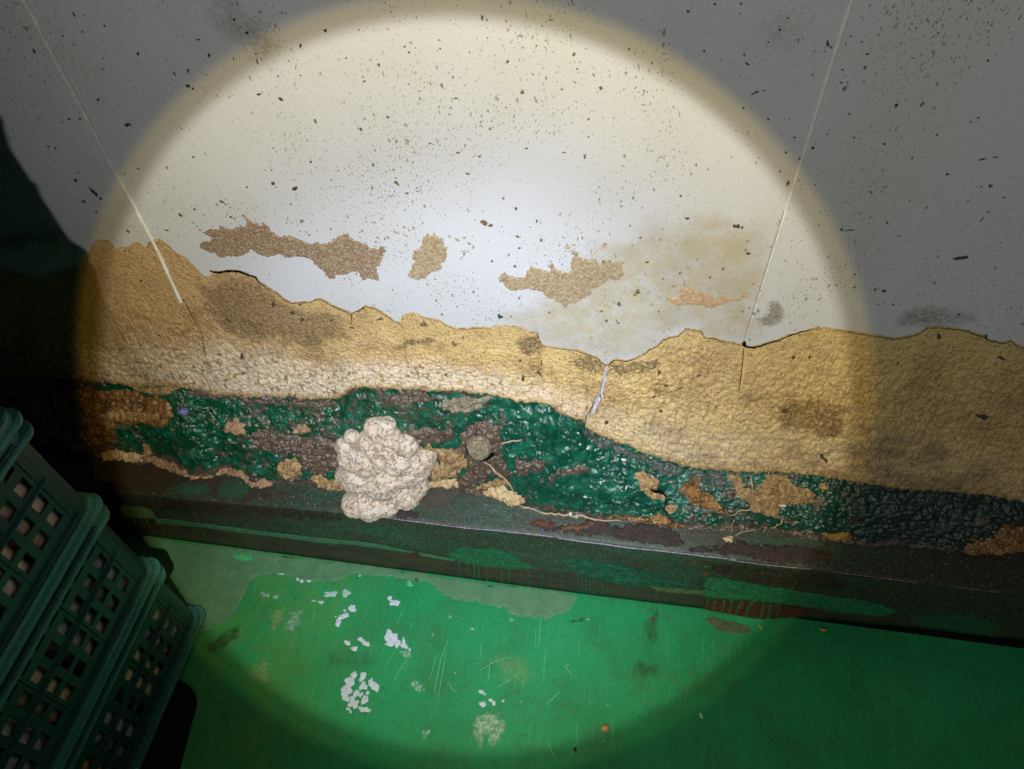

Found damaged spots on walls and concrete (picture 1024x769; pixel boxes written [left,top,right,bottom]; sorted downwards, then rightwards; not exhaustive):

crack [210,270,399,325]
peeling [0,202,829,529]
crack [537,327,1024,392]
corrosion [703,600,807,620]
peeling [344,637,370,651]
peeling [384,629,412,658]
peeling [341,671,379,713]